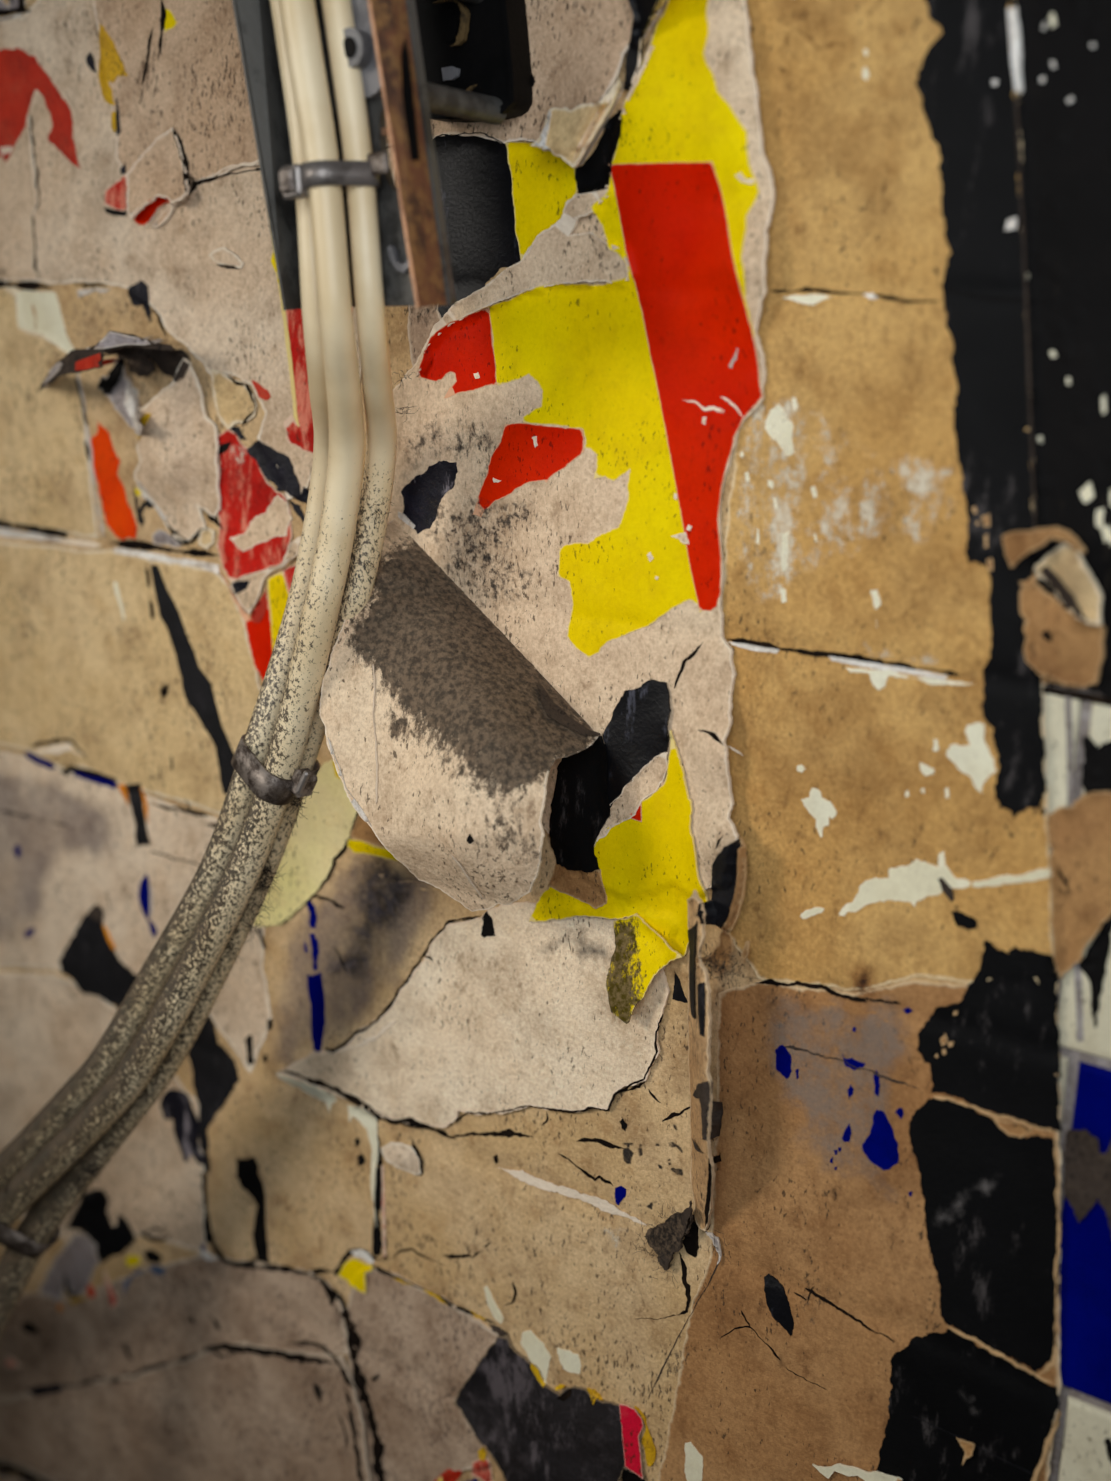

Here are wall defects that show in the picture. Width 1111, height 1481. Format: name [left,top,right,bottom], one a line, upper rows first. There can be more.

crack [173,126,260,195]
crack [274,915,702,1186]
peeling [935,1033,954,1058]
peeling [1063,1129,1111,1230]
crack [137,1227,171,1241]
crack [62,1246,385,1481]
crack [0,1459,57,1481]
peeling [956,1437,975,1465]